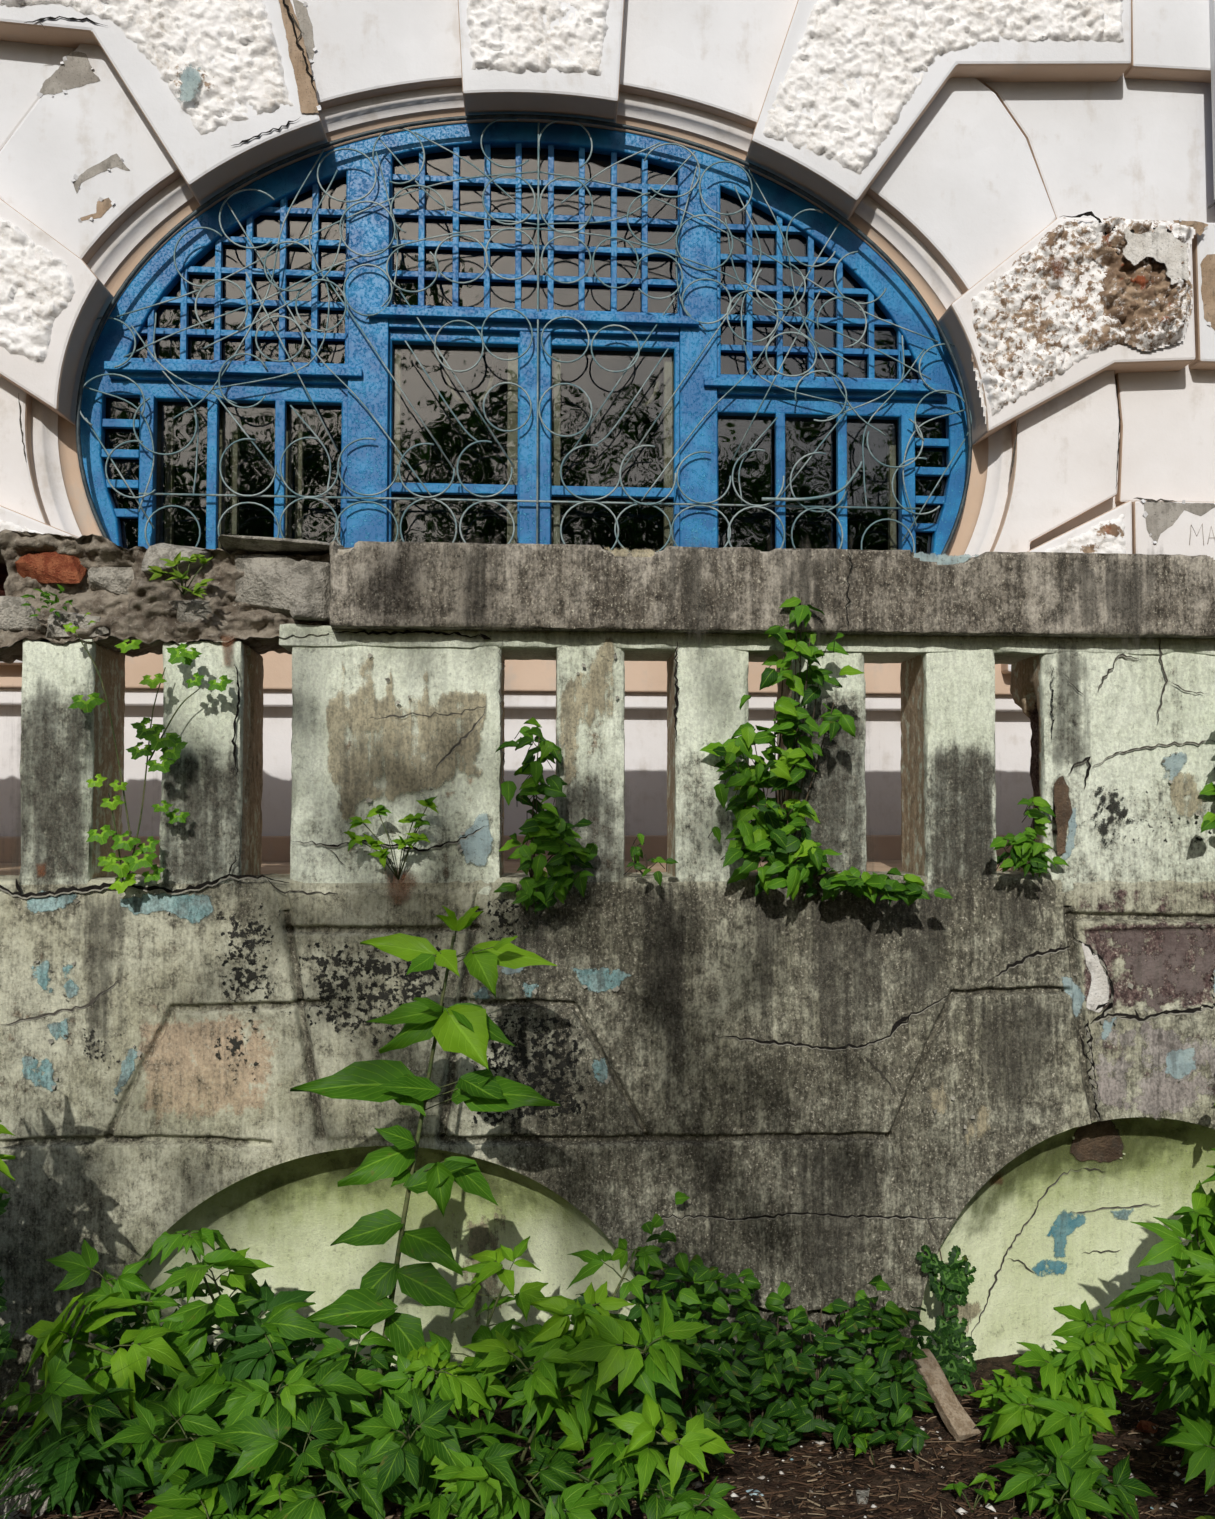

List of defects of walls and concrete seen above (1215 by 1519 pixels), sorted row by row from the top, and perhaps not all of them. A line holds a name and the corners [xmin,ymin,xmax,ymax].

crack [231,0,316,146]
spalling [1086,217,1215,351]
spalling [0,529,344,664]
peeling [1141,499,1215,544]
crack [0,630,505,899]
water stain [806,707,862,871]
water stain [934,752,992,875]
crack [1050,639,1215,796]
water stain [214,903,280,1081]
water stain [285,932,442,1046]
crack [987,937,1215,1120]
peeling [1062,924,1215,1163]